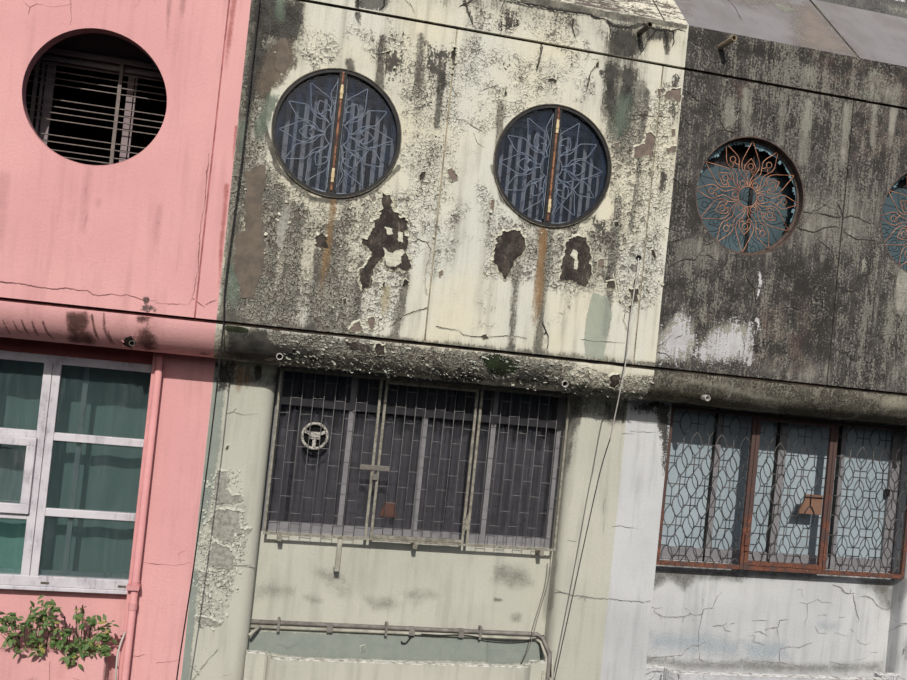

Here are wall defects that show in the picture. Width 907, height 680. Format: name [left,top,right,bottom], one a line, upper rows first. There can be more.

crack [501,0,686,56]
corrosion [332,99,342,168]
corrosion [549,133,557,199]
leakage [742,87,752,117]
leakage [841,104,852,146]
peeling [340,191,423,294]
peeling [486,225,528,282]
corrosion [533,212,549,320]
peeling [552,233,650,359]
crack [797,200,877,266]
efflorescence [658,308,761,367]
crack [556,585,907,680]